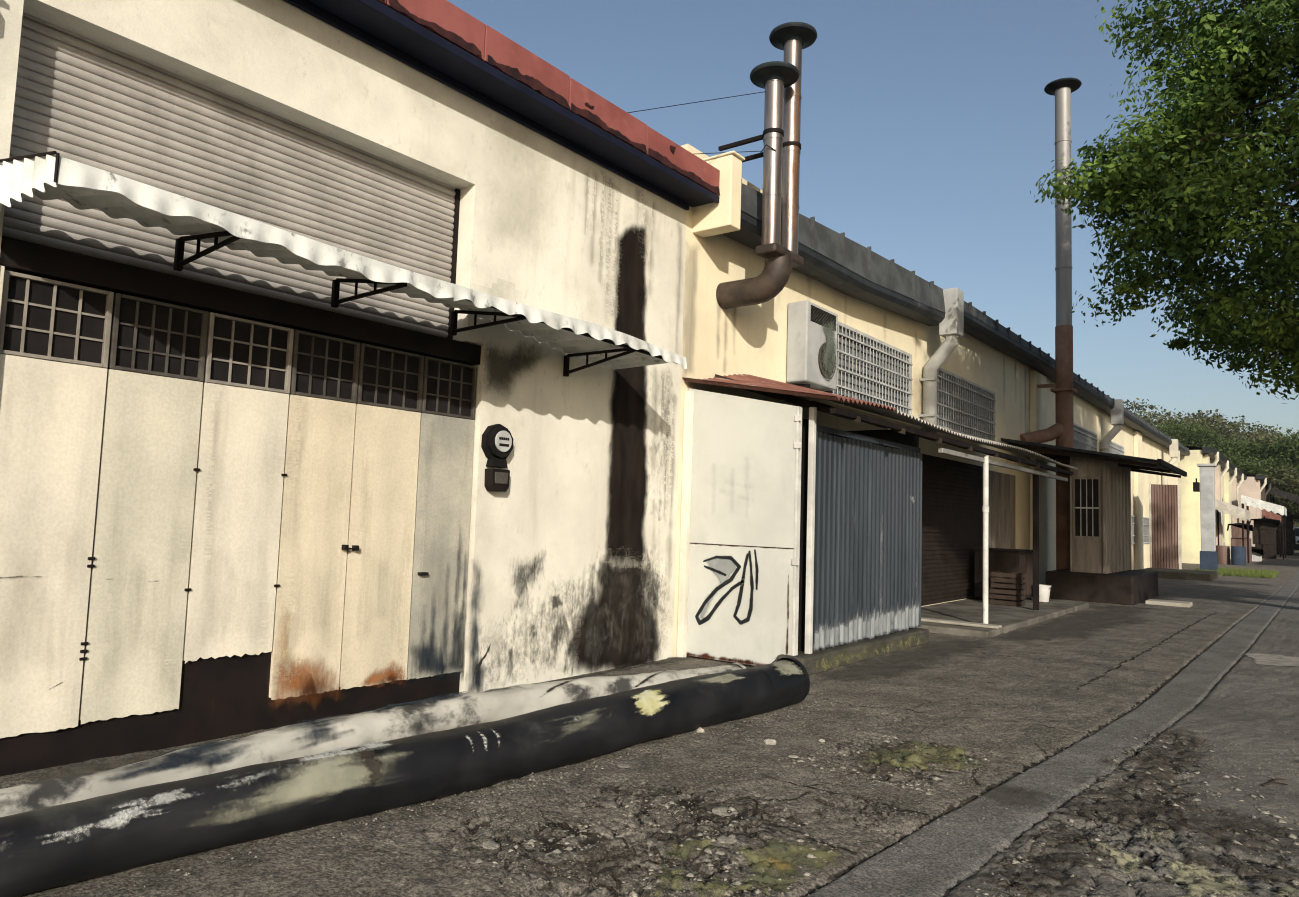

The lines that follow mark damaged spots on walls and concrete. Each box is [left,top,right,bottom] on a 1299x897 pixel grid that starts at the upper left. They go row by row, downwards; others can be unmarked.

leakage [514,559,538,597]
leakage [428,557,484,692]
leakage [552,582,598,671]
rust [277,664,327,697]
rust [365,667,402,685]
crack [424,613,1299,897]